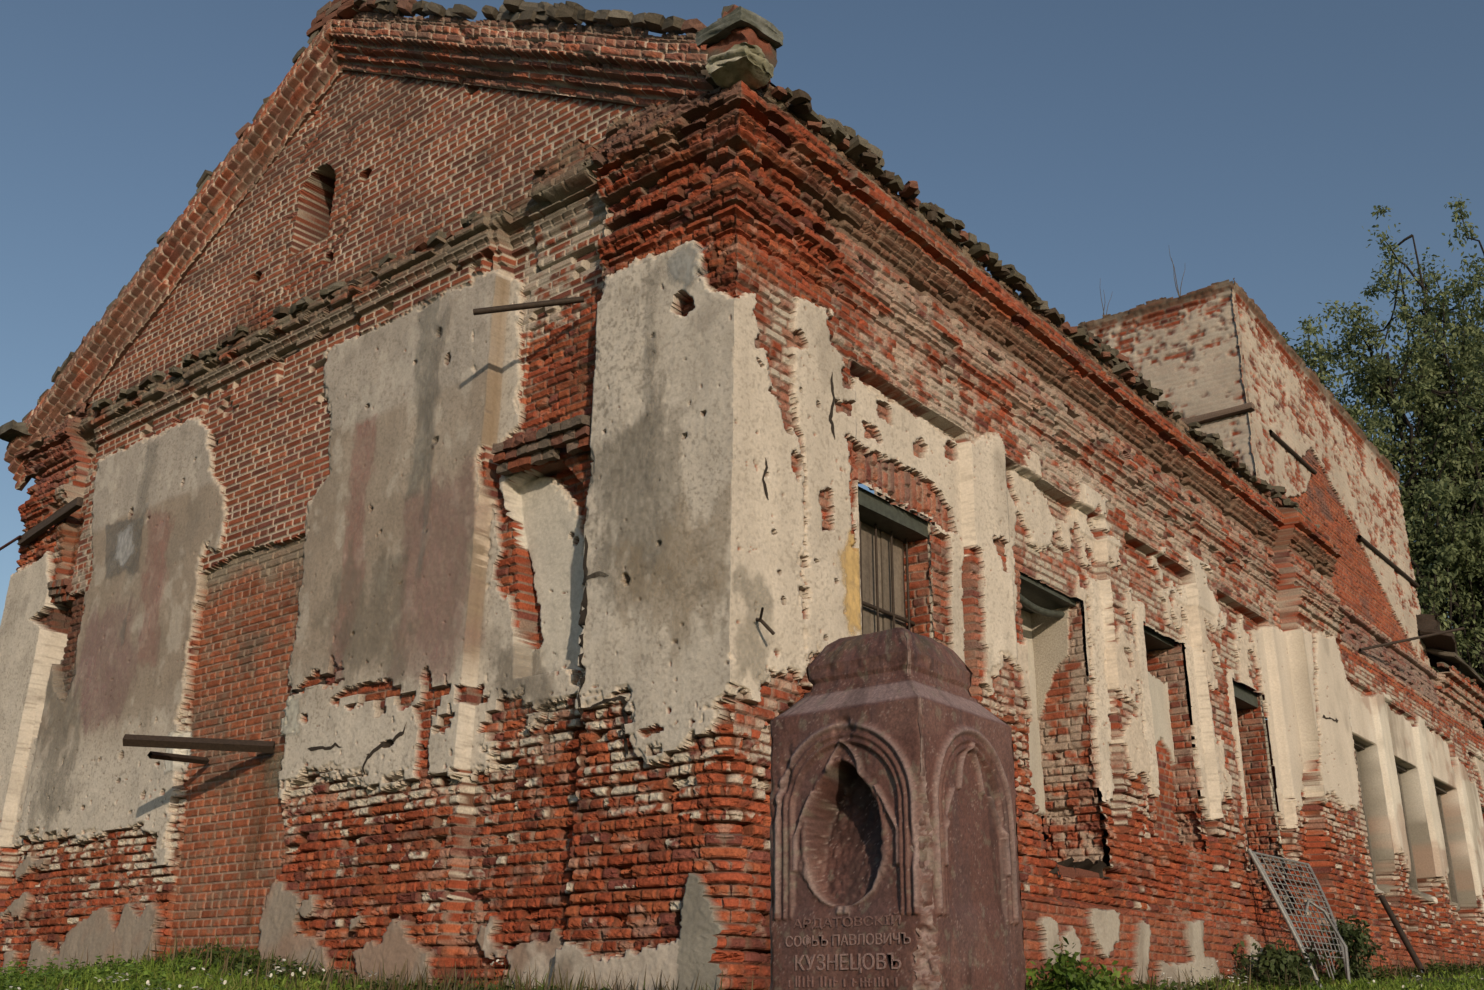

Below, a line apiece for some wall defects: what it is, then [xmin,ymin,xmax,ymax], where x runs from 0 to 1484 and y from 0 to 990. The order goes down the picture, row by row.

crack [828,373,836,439]
flaking render [0,417,229,975]
crack [308,722,407,781]
crack [577,535,628,756]
spalling [257,240,1484,990]